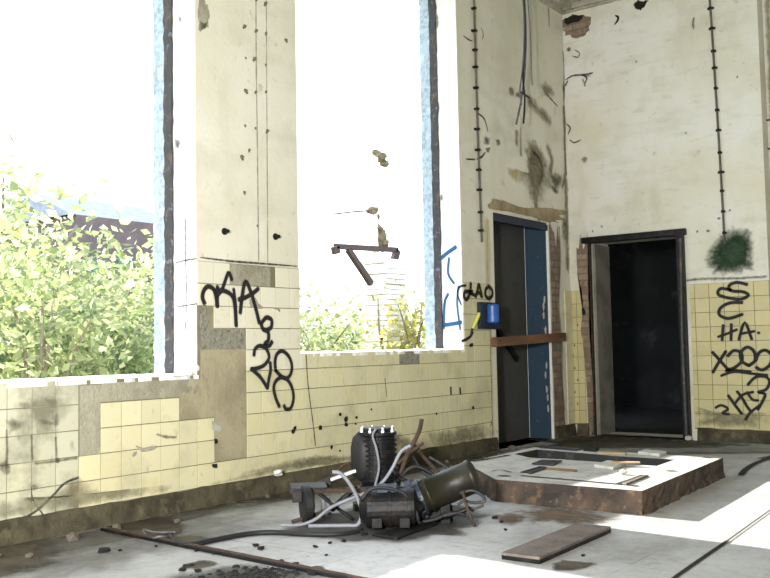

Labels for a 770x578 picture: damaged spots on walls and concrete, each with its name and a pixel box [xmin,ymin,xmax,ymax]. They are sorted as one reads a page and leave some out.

flaking render [562,14,591,38]
leakage [512,146,561,208]
peeling [79,218,247,468]